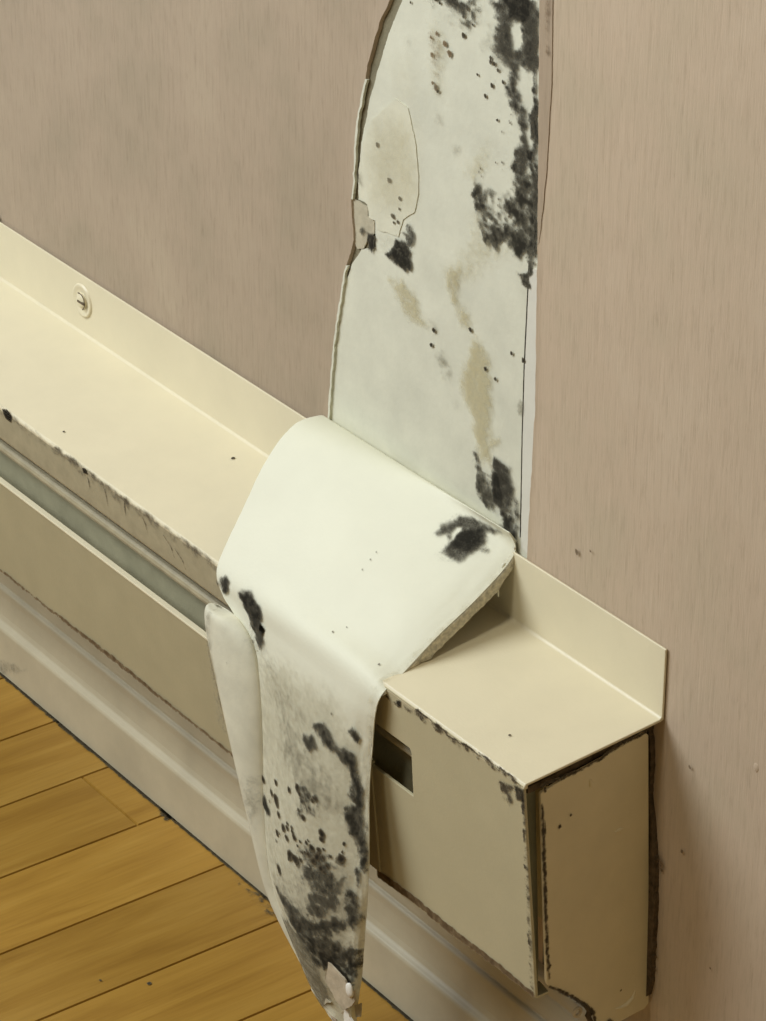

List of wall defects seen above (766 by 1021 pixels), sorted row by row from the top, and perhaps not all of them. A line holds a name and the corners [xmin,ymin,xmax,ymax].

mould [434,0,480,38]
mould [385,196,414,272]
mould [471,0,539,289]
damp [436,314,519,561]